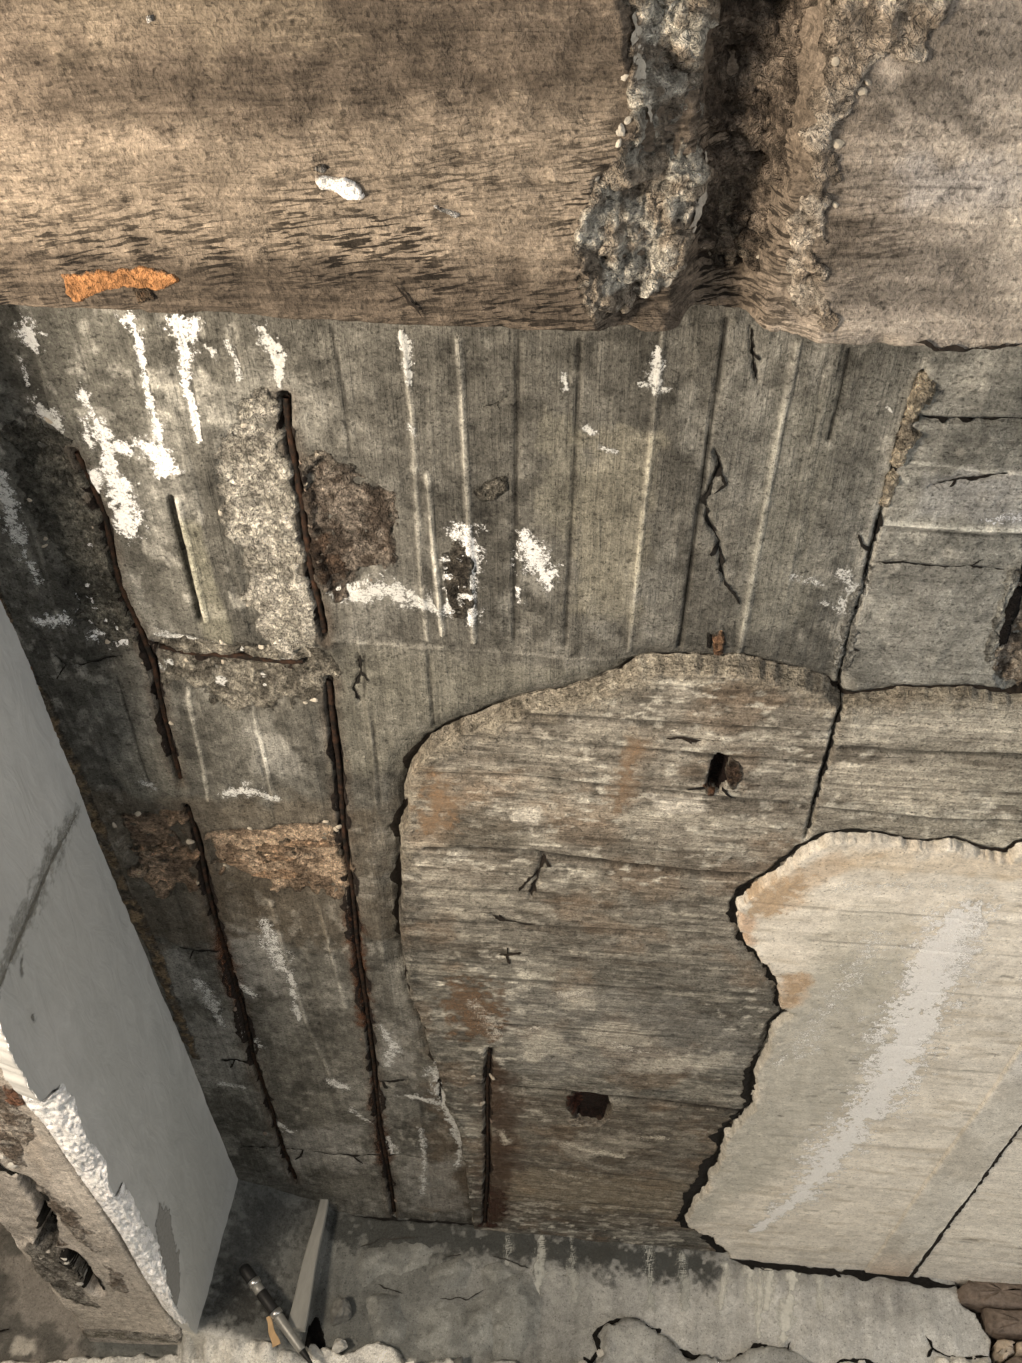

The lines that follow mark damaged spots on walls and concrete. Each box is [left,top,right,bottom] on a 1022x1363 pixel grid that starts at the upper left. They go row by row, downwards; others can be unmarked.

spalling [571,0,953,333]
efflorescence [76,310,181,539]
efflorescence [164,314,243,444]
crack [750,328,760,379]
efflorescence [326,521,488,627]
efflorescence [512,528,564,603]
crack [352,655,369,701]
spalling [0,387,399,1212]
crack [390,340,1022,1289]
flaking render [0,1024,186,1343]
crack [347,1214,473,1225]
flaking render [934,1280,1022,1363]